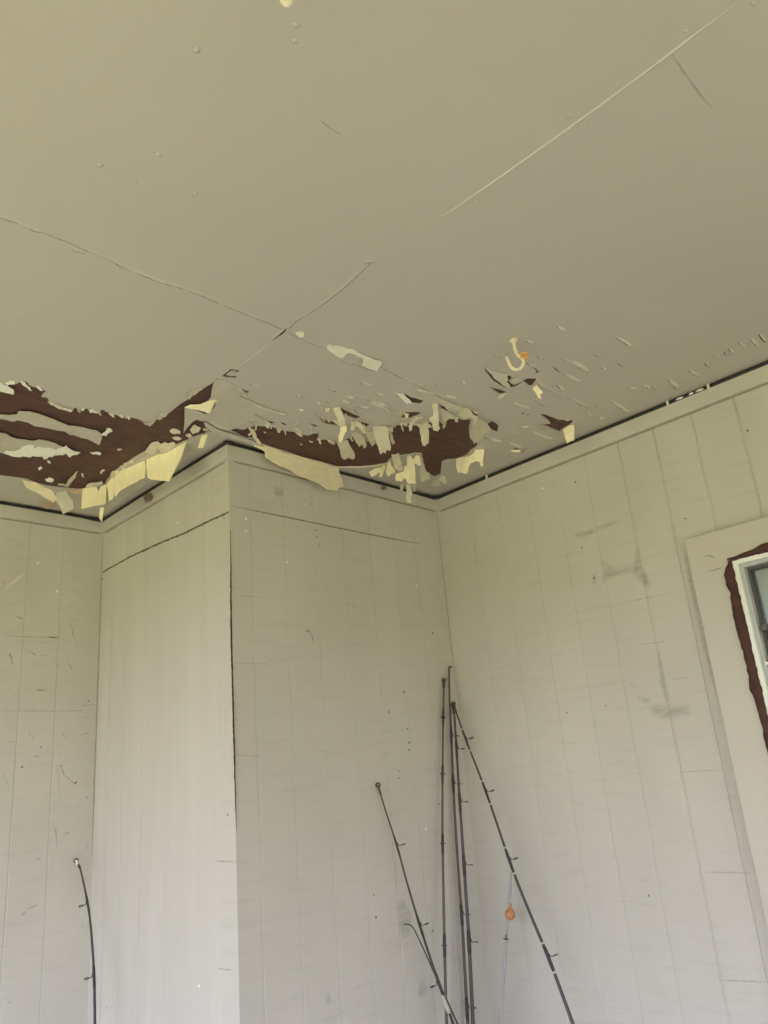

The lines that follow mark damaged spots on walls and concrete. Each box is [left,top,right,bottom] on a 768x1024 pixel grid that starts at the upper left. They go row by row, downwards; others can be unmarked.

peeling [0,340,630,522]